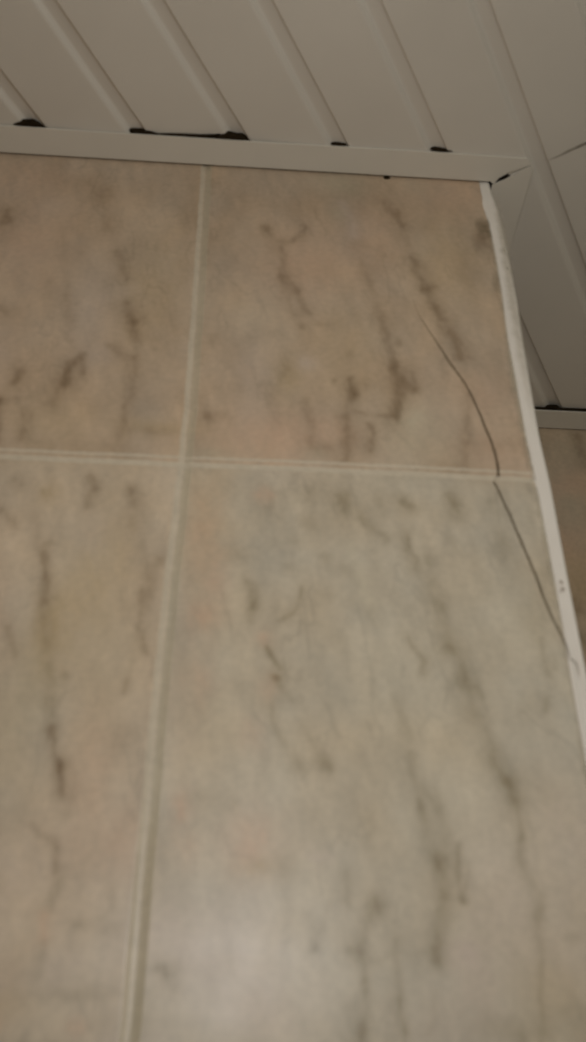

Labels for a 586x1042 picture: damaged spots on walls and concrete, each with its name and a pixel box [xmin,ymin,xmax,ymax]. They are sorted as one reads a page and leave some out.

crack [466,385,539,584]